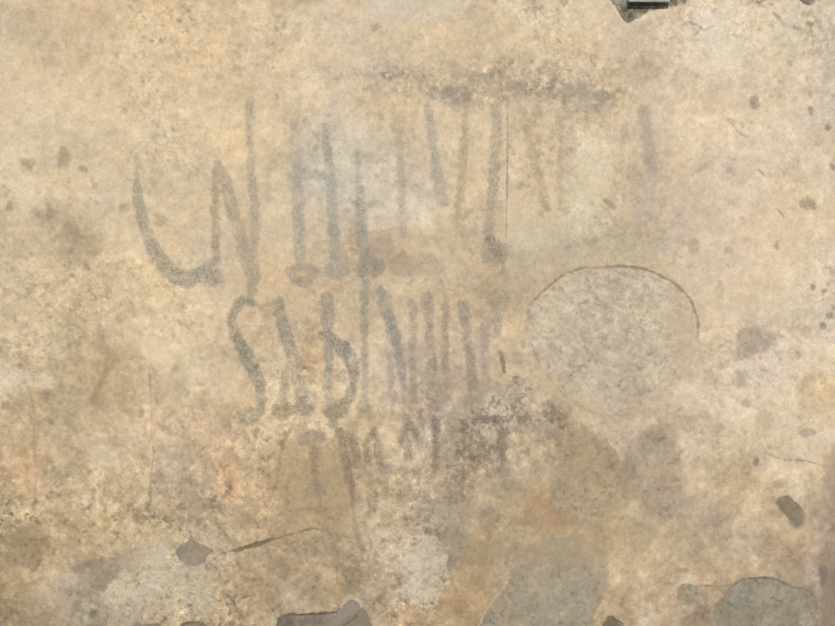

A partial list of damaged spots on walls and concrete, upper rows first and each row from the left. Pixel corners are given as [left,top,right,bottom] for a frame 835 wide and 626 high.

flaking render [611,0,687,23]
crack [212,527,372,565]
spalling [818,564,830,588]
spalling [277,599,372,626]
spalling [602,615,624,626]
spalling [713,575,823,626]